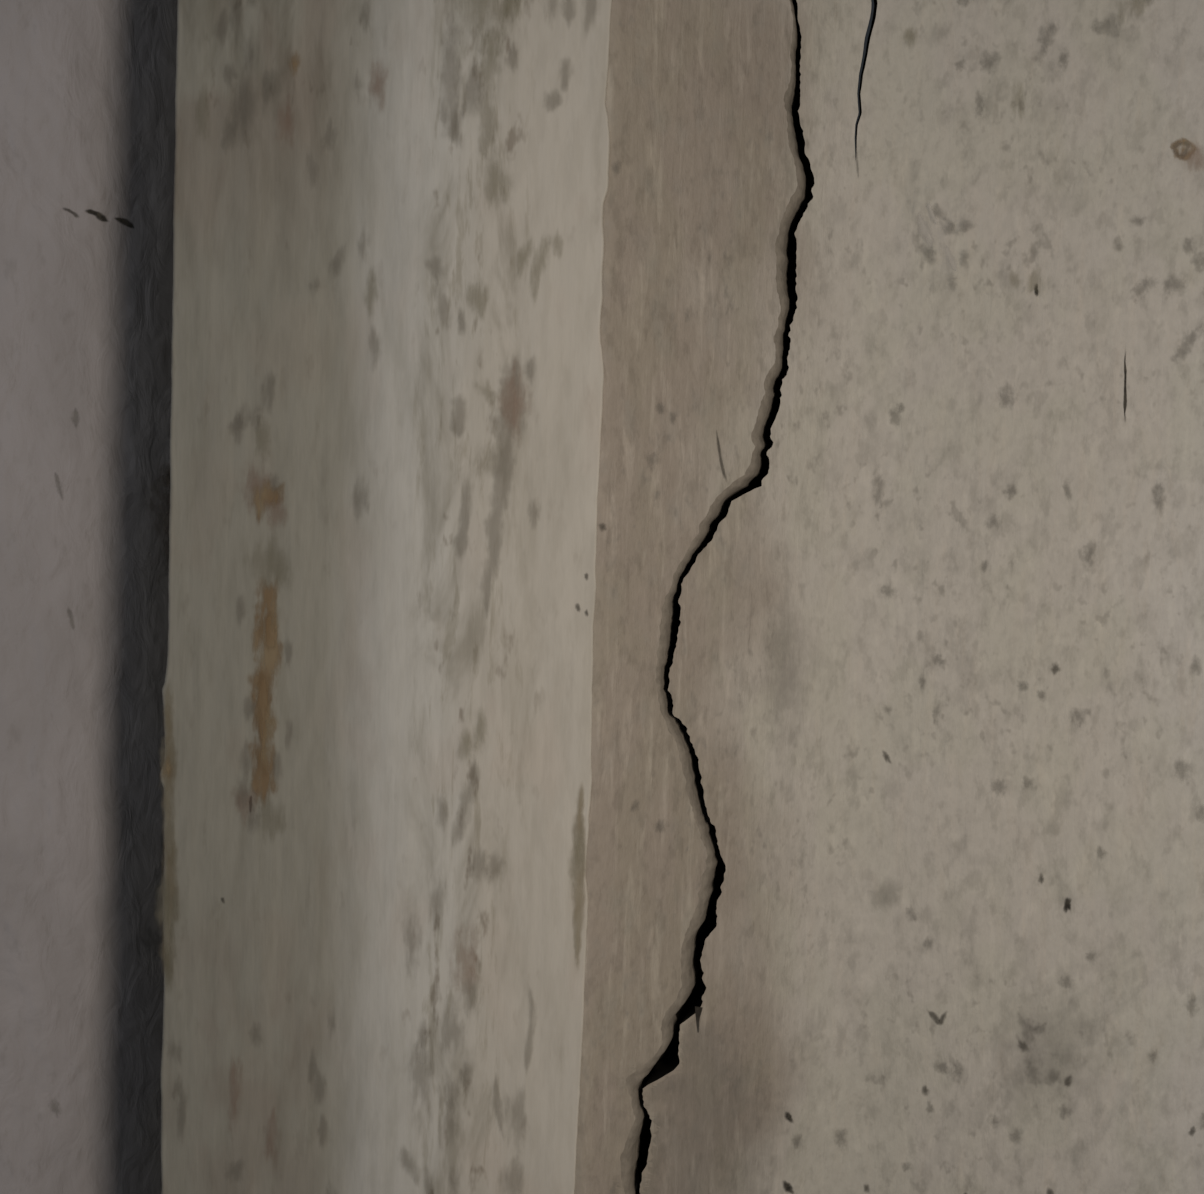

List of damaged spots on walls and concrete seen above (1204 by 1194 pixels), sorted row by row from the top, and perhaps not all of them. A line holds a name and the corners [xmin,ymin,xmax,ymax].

crack [856,0,877,153]
corrosion [252,586,281,801]
crack [620,0,815,1194]